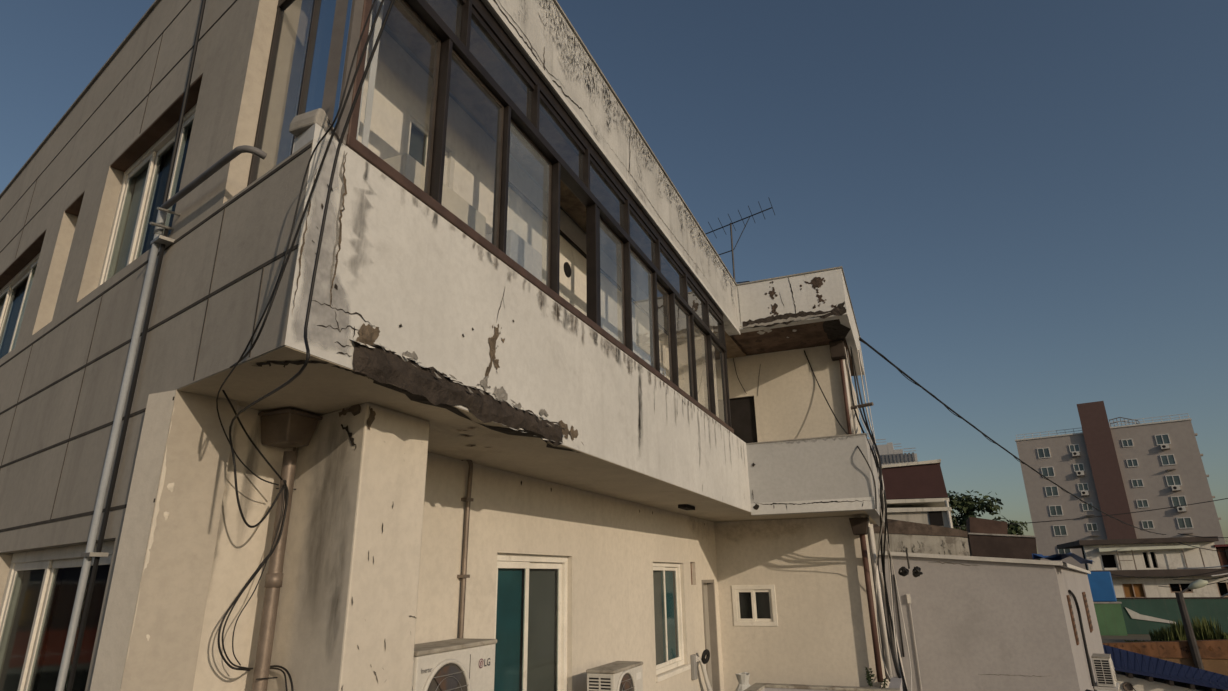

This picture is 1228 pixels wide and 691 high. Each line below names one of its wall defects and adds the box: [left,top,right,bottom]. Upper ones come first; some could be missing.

water stain [543,0,720,271]
spalling [739,275,850,351]
peeling [338,404,376,430]
spalling [351,320,584,453]